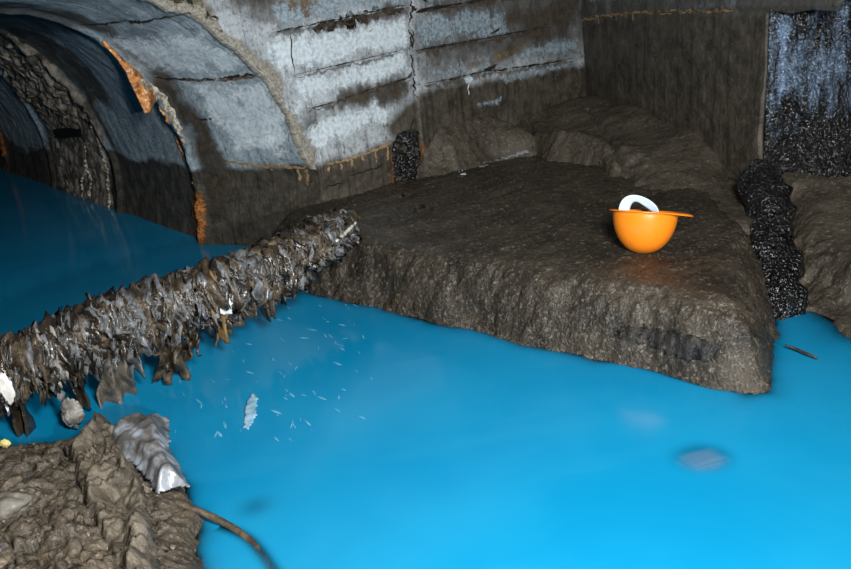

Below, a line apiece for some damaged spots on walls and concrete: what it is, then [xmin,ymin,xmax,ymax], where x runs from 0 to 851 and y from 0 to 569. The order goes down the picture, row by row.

water stain [0,30,171,153]
water stain [80,143,92,199]
water stain [90,125,111,208]
corrosion [101,40,193,183]
water stain [105,31,289,215]
corrosion [191,194,206,245]
crack [396,1,418,101]
water stain [389,118,425,183]
water stain [267,0,578,154]
water stain [479,149,529,167]